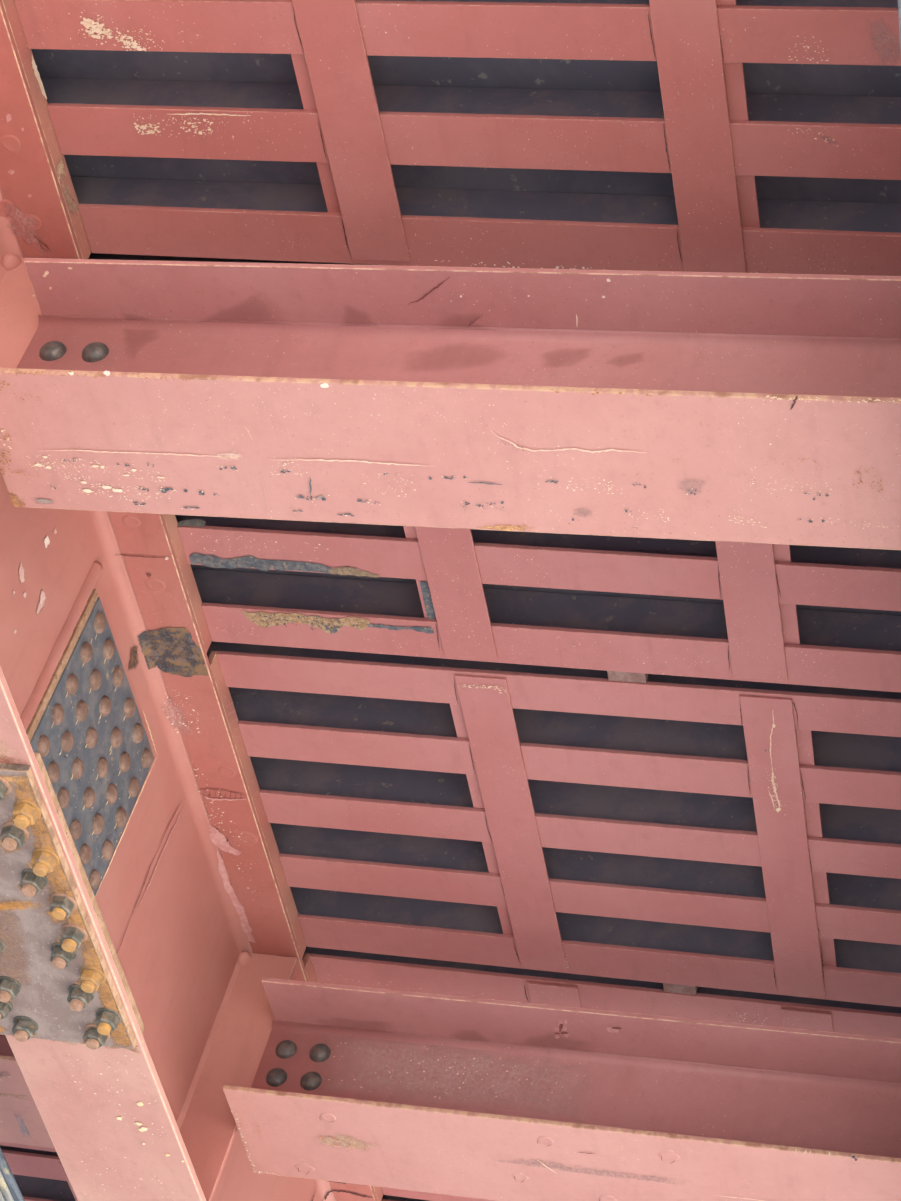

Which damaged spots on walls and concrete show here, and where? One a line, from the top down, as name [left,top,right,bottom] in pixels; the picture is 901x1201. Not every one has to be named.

peeling [23,455,379,578]
peeling [129,627,208,677]
peeling [216,581,436,636]
rust [0,759,137,1051]